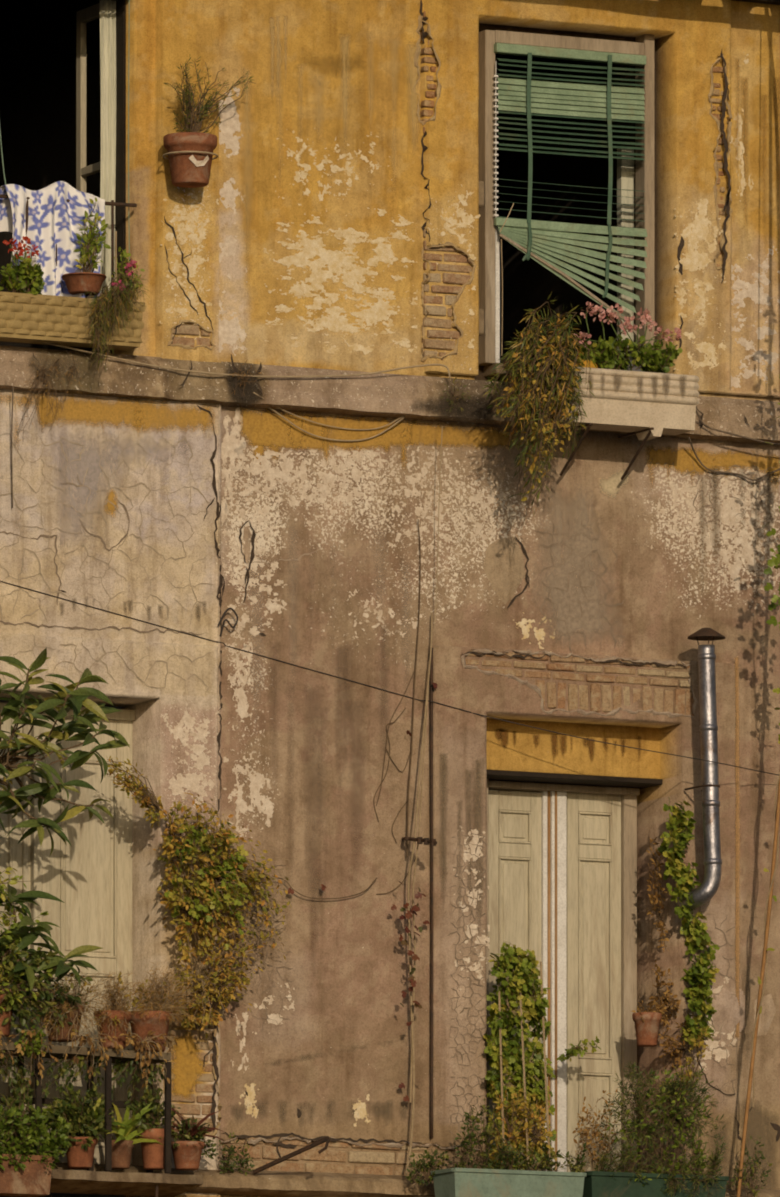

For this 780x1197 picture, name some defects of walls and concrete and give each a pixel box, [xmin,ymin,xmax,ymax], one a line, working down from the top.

peeling [159,178,247,356]
peeling [219,87,243,158]
peeling [264,128,480,363]
crack [421,131,431,242]
crack [721,51,731,283]
peeling [674,52,780,390]
crack [0,216,324,811]
peeling [160,407,511,837]
crack [463,518,686,667]
flaking render [460,612,697,719]
crack [202,992,422,1158]
crack [447,833,486,1135]